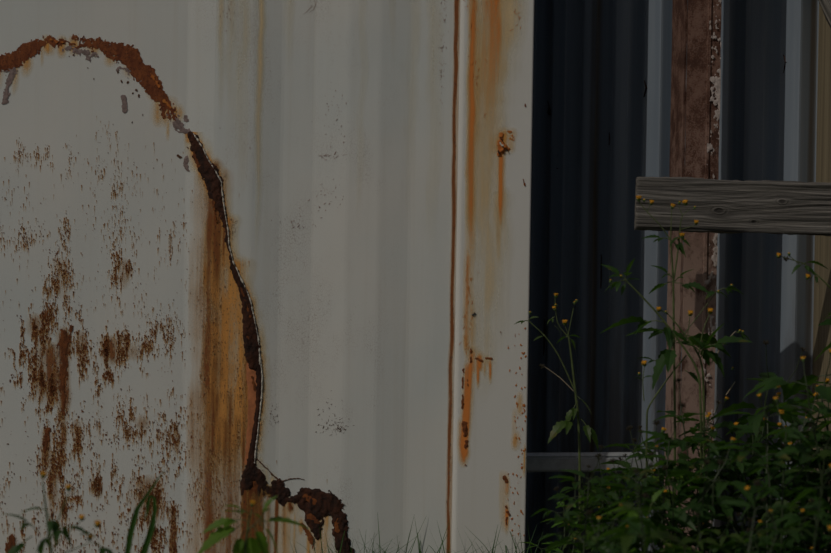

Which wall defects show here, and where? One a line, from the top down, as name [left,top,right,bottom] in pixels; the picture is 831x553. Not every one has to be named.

corrosion [0,116,355,553]
crack [185,131,305,491]
corrosion [446,0,493,553]
corrosion [466,0,502,243]
corrosion [496,131,515,221]